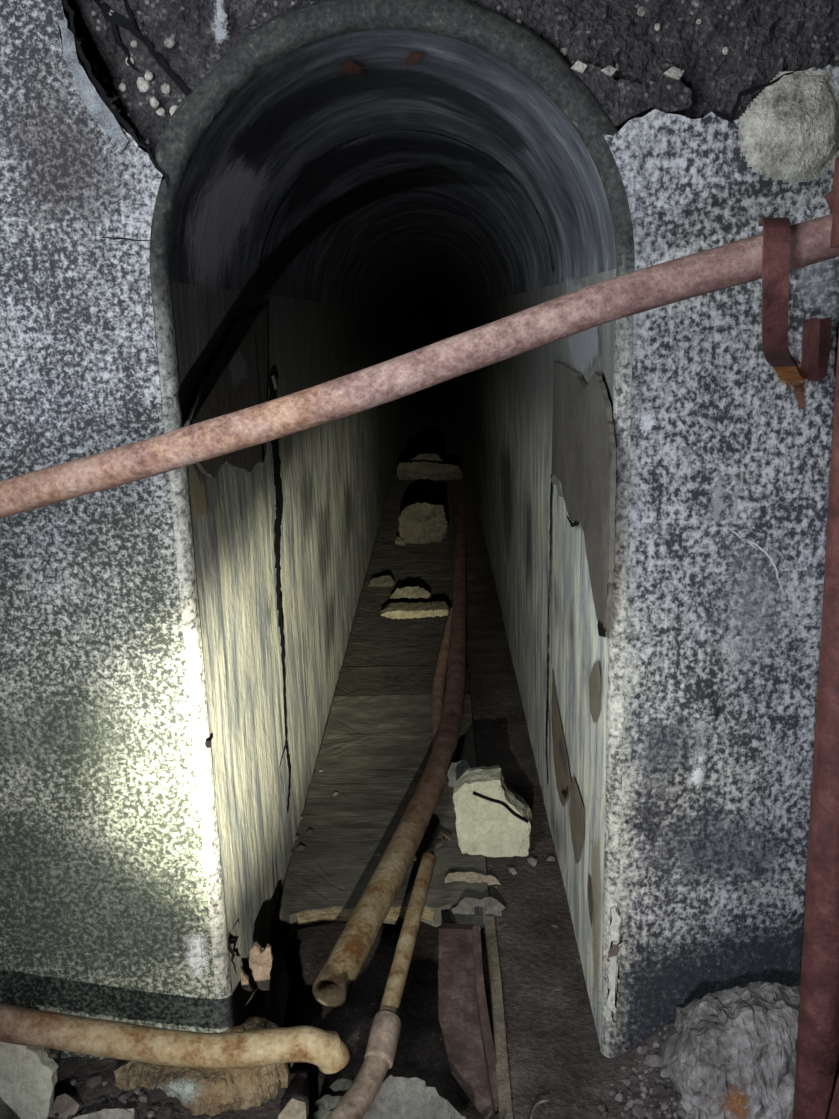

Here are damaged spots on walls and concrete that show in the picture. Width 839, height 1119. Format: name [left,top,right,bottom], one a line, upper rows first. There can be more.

crack [62,0,191,188]
spalling [57,0,324,155]
spalling [469,0,839,129]
crack [268,371,277,401]
peeling [550,361,616,637]
crack [271,438,291,813]
peeling [551,668,584,863]
peeling [589,660,601,723]